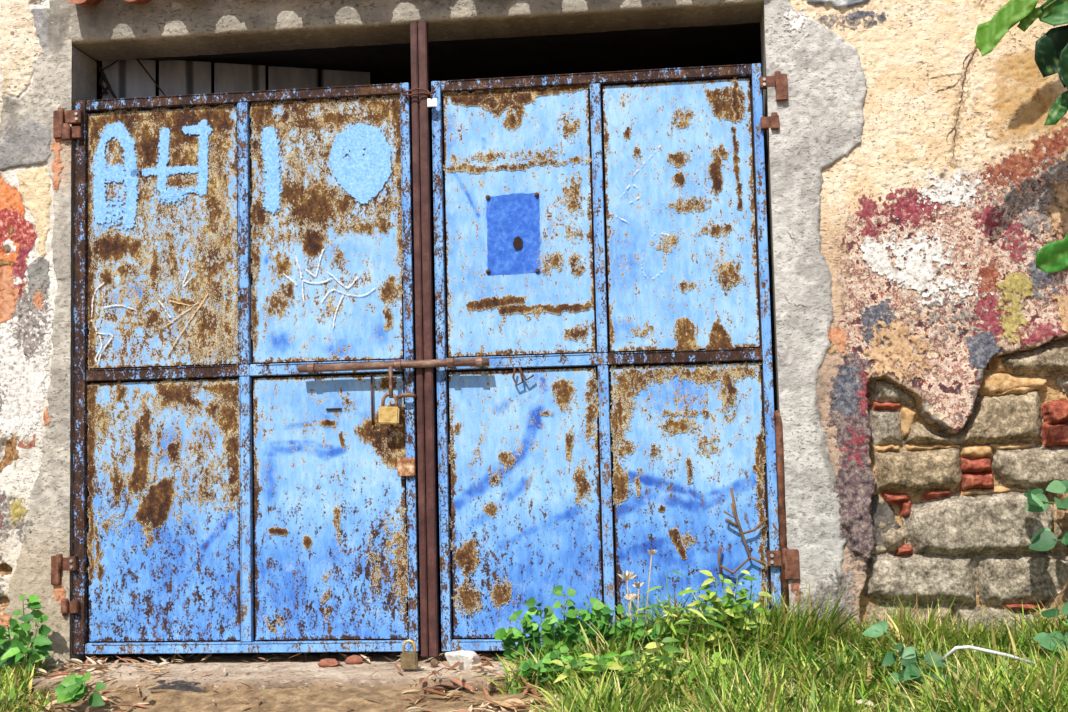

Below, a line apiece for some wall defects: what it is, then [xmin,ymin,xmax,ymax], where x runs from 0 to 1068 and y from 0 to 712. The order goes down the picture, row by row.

flaking render [778,5,887,41]
corrosion [443,84,590,131]
corrosion [442,108,592,278]
corrosion [653,76,751,237]
crack [919,46,979,169]
peeling [0,166,54,472]
corrosion [86,95,406,590]
corrosion [466,295,594,343]
corrosion [540,313,762,510]
flaking render [822,147,1068,638]
peeling [0,490,32,642]
corrosion [450,538,517,616]